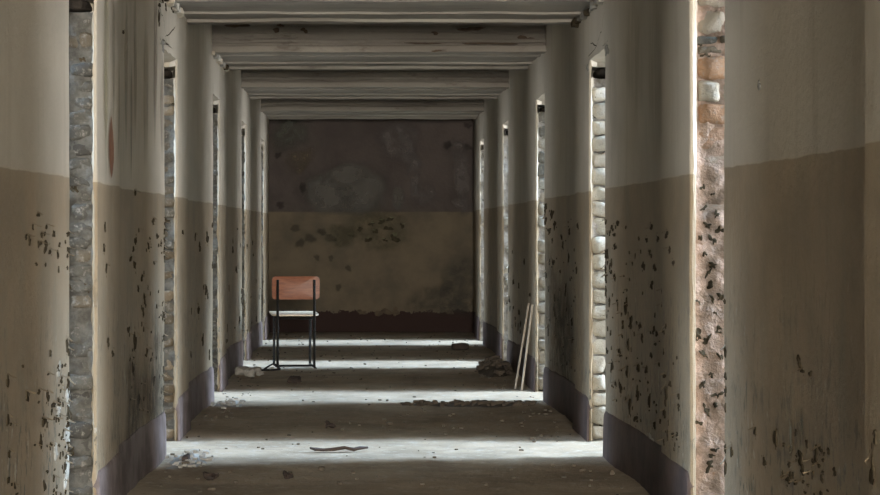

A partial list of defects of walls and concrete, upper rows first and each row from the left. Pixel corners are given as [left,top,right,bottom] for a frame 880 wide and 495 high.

flaking render [25,0,109,495]
flaking render [127,69,184,440]
flaking render [189,107,263,391]
flaking render [529,106,579,391]
flaking render [585,64,680,451]
peeling [773,427,836,495]